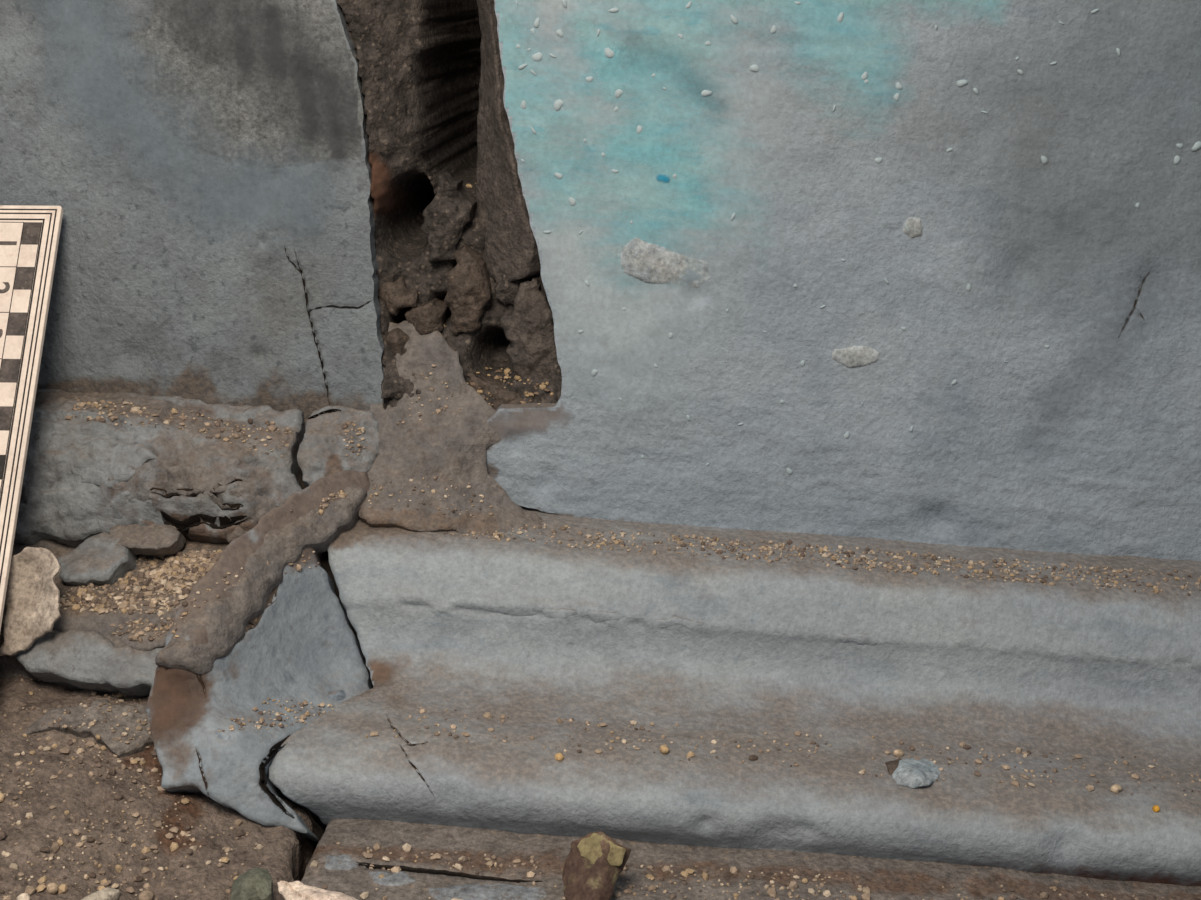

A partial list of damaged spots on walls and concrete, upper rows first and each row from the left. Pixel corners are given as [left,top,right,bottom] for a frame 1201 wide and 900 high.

spalling [118,0,562,410]
water stain [496,0,741,356]
crack [284,247,369,433]
crack [1118,272,1150,338]
crack [296,465,306,490]
spalling [0,389,373,841]
crack [321,551,370,672]
crack [259,735,324,844]
crack [386,714,434,796]